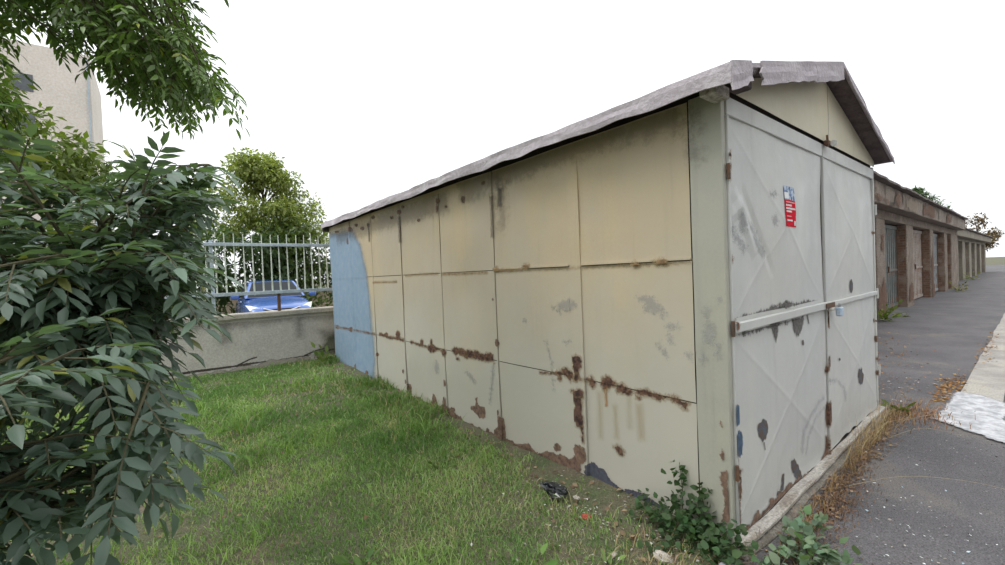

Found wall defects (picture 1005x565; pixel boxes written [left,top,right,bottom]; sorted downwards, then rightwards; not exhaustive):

corrosion [336,326,494,362]
peeling [398,369,664,511]
corrosion [540,355,689,442]
peeling [758,419,768,450]
corrosion [822,402,832,459]
peeling [719,449,729,523]
corrosion [738,460,808,530]
peeling [777,458,802,495]